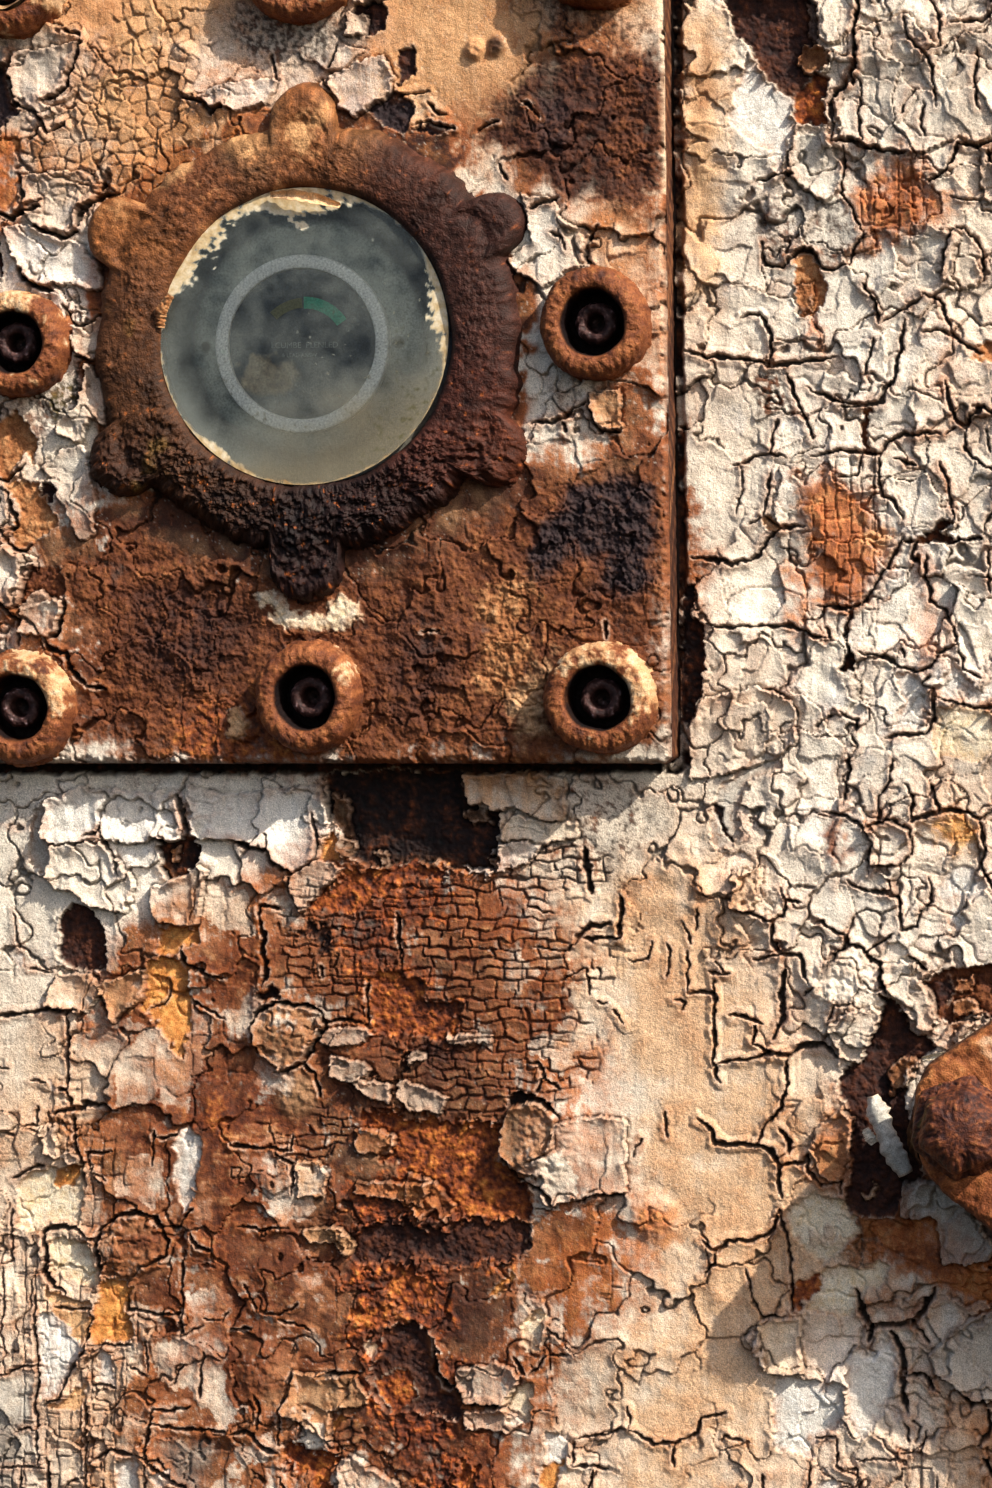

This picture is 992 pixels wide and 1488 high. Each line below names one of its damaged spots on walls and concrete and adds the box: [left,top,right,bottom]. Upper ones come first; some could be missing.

crack [0,22,128,369]
corrosion [47,0,235,177]
corrosion [360,0,666,226]
peeling [709,0,992,213]
corrosion [59,452,671,763]
peeling [679,568,803,906]
crack [492,0,992,1329]
peeling [0,763,586,1074]
crack [0,784,413,1488]
corrosion [76,907,410,1424]
peeling [269,947,633,1488]
crack [525,1256,992,1488]